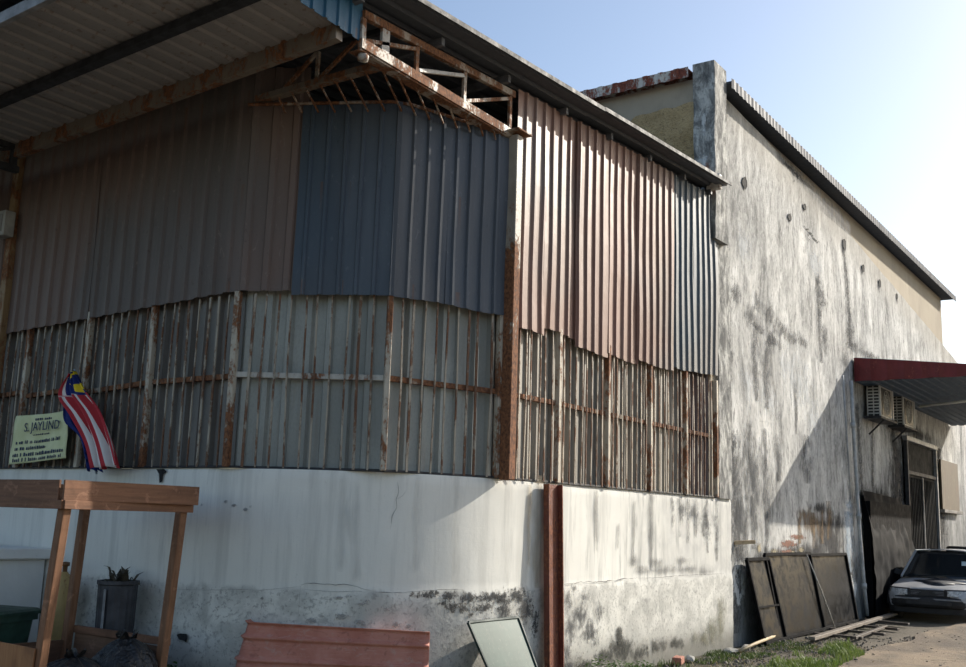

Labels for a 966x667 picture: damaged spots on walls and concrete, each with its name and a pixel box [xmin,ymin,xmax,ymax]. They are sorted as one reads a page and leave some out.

leakage [811,256,830,363]
leakage [730,282,818,484]
leakage [855,403,875,495]
leakage [889,428,905,505]
leakage [633,494,668,573]
leakage [672,497,719,560]
leakage [731,421,781,633]
leakage [566,585,684,667]